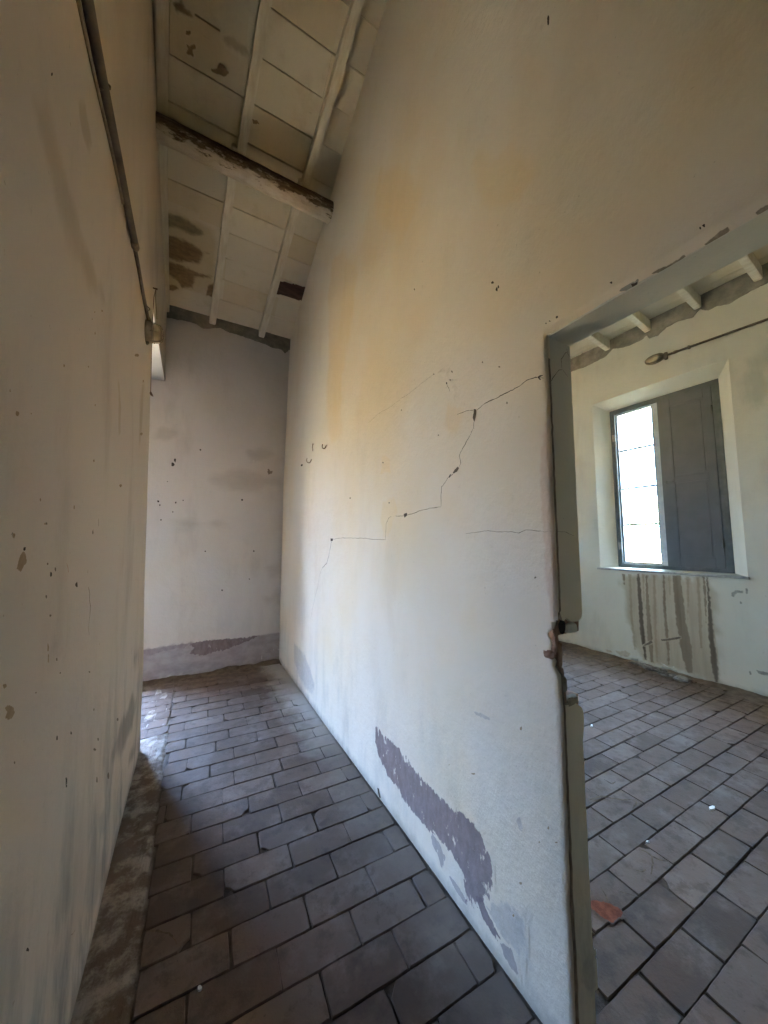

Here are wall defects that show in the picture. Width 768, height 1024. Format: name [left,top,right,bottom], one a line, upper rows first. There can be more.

water stain [168,201,220,300]
crack [363,352,570,540]
peeling [143,629,280,681]
water stain [613,571,733,686]
peeling [375,724,530,983]